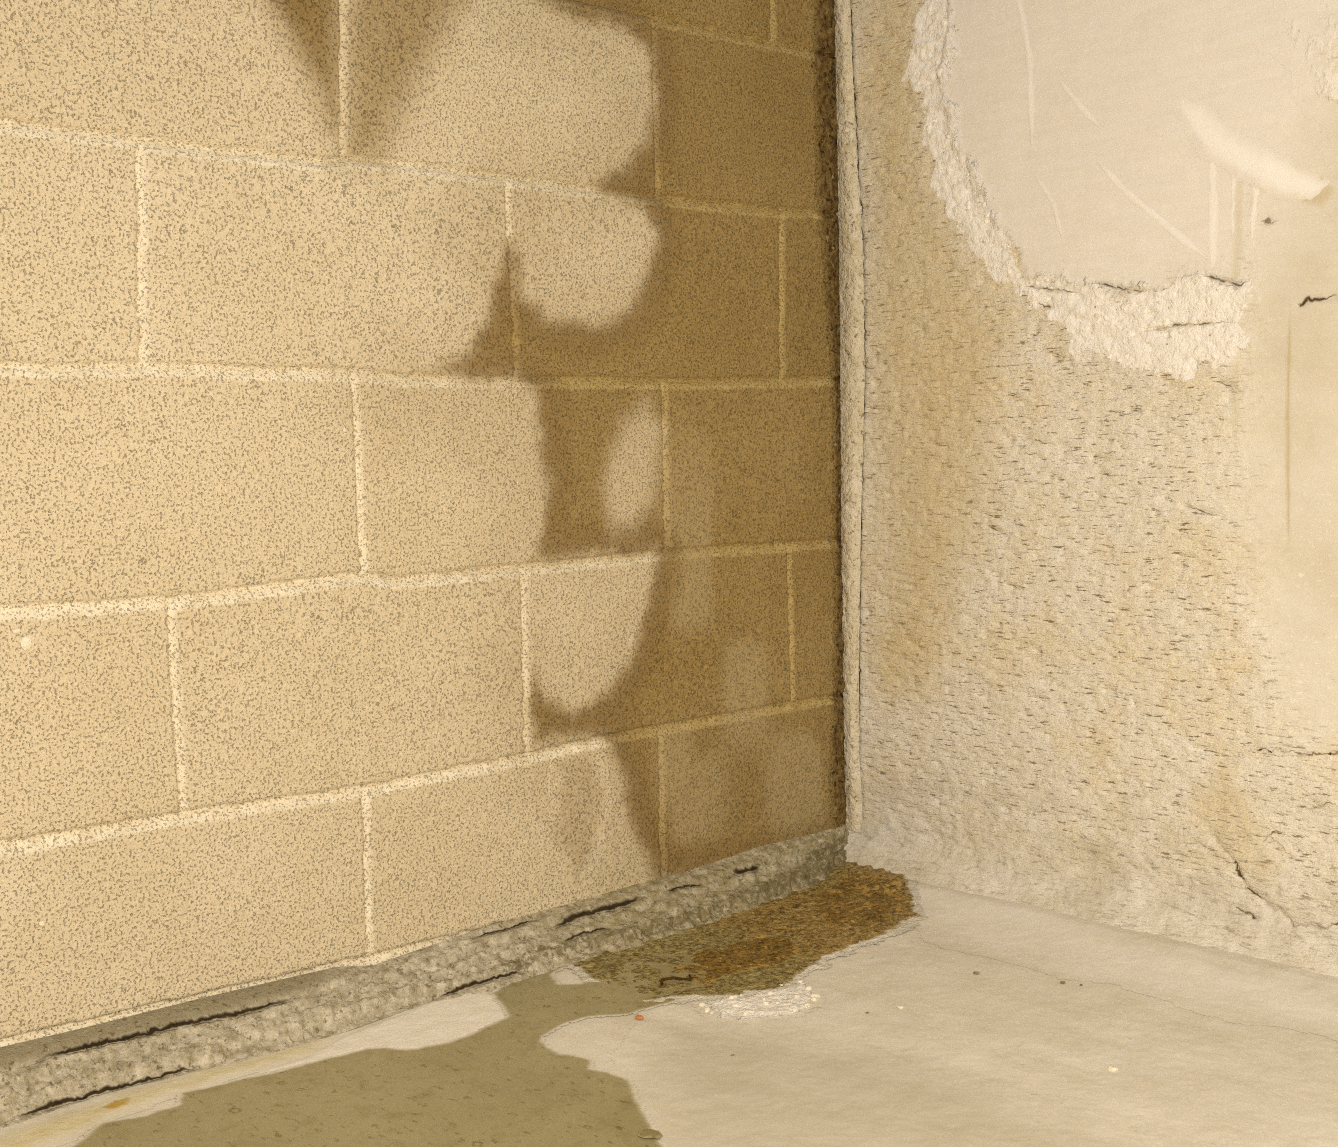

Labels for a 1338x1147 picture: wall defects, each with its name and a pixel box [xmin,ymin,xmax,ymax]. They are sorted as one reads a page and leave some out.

peeling [902,0,1265,395]
water stain [1299,176,1337,211]
water stain [235,0,849,1074]
crack [1246,742,1338,757]
crack [1215,802,1338,932]
crack [434,969,524,999]
crack [26,994,303,1066]
crack [1,1063,206,1123]